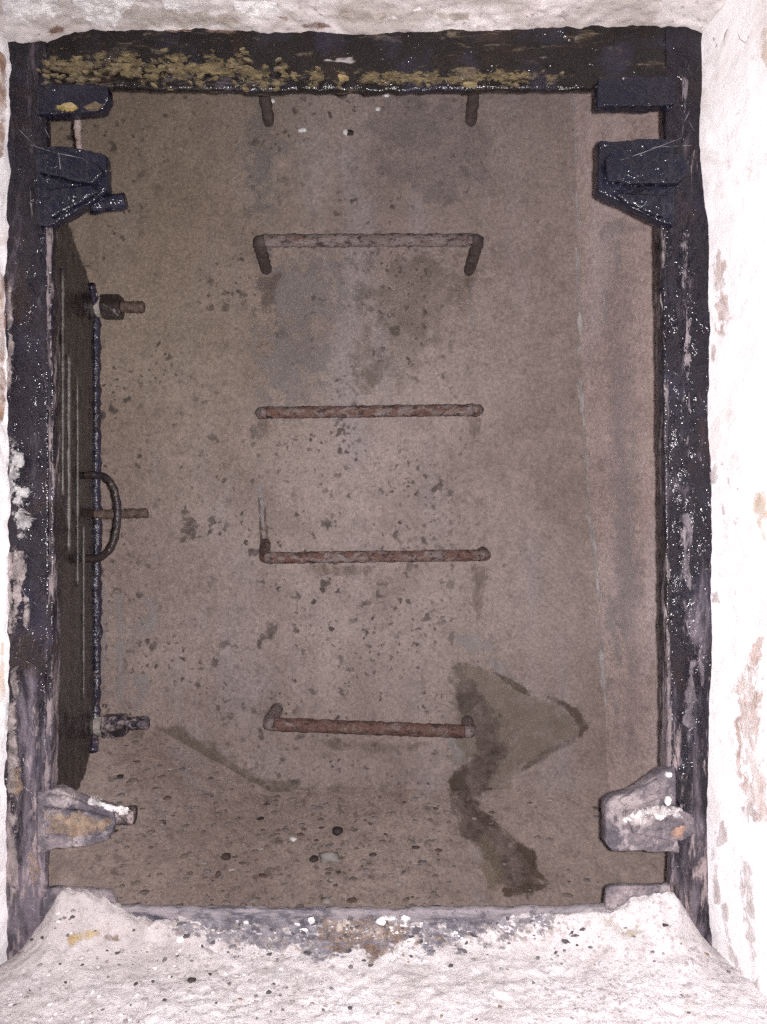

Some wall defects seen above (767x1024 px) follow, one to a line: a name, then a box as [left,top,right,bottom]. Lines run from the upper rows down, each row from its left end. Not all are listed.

damp [449,633,588,897]